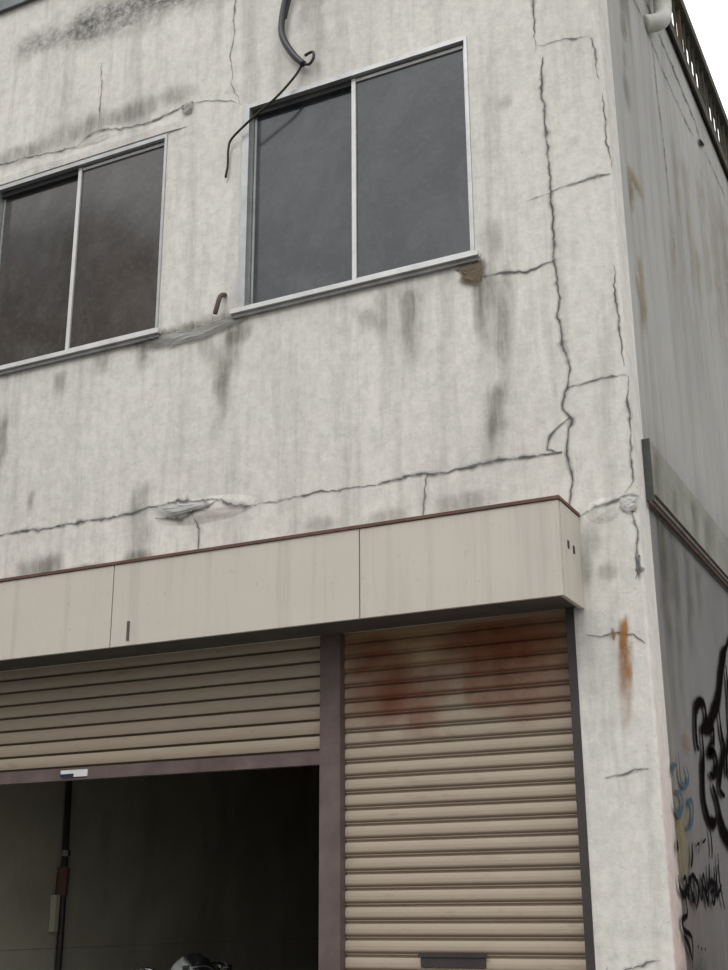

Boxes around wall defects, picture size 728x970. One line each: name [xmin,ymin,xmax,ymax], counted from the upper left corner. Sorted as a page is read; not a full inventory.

crack [635,0,728,204]
crack [0,0,639,576]
rust [612,619,631,679]